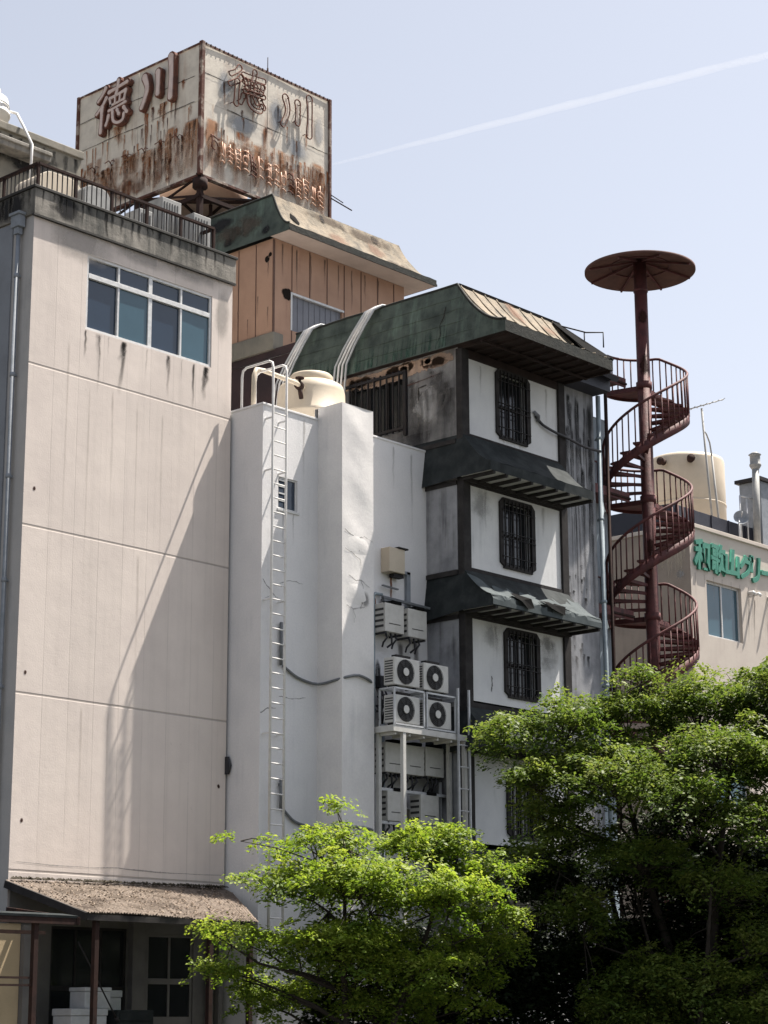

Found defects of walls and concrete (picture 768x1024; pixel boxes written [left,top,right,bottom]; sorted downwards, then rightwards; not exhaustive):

spalling [342,353,454,391]
crack [346,529,363,617]